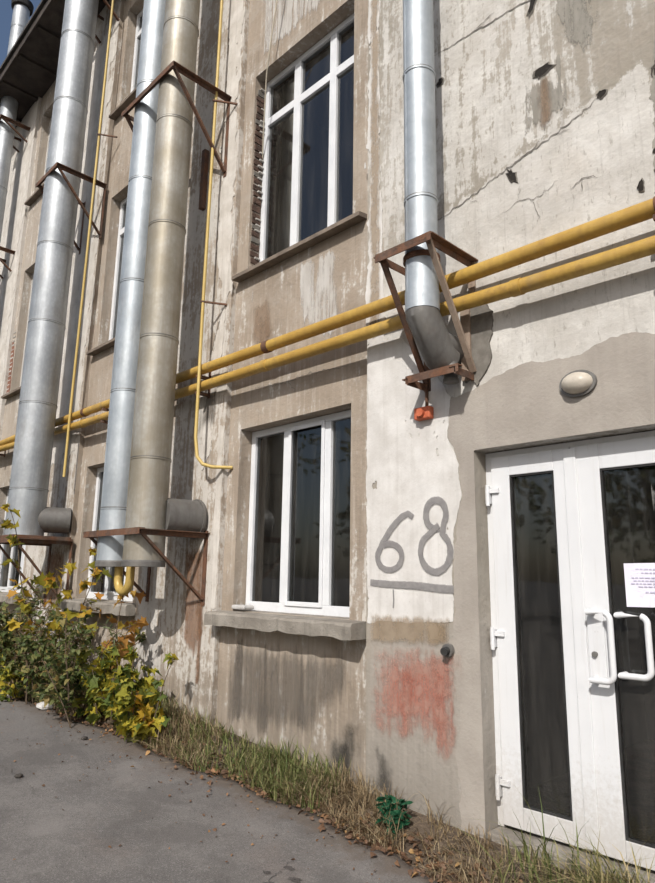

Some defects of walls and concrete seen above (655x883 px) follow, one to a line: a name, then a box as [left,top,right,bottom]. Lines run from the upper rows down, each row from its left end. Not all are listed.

crack [434,0,530,56]
crack [438,99,595,220]